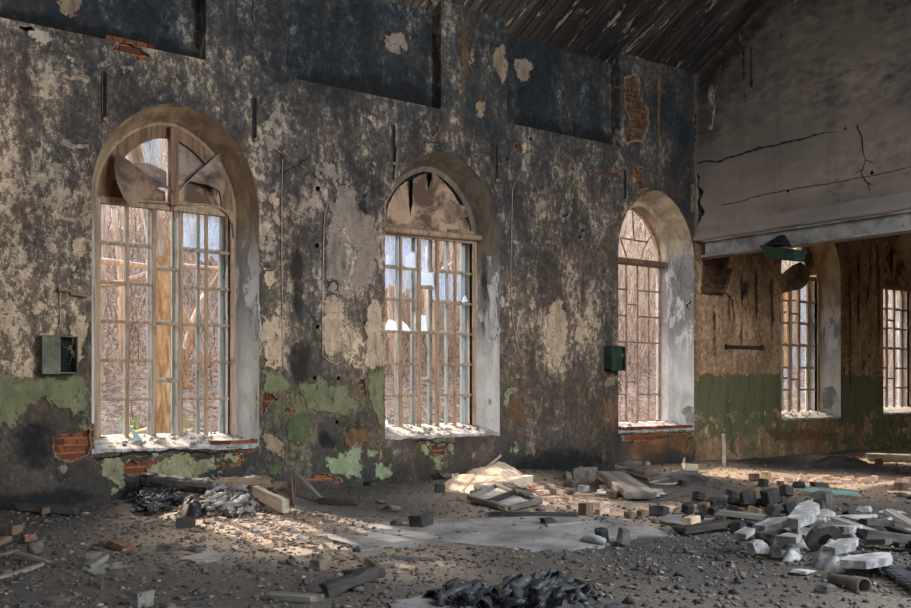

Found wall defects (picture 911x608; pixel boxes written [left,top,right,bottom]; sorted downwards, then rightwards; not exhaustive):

flaking render [55,0,83,18]
spalling [105,35,154,78]
flaking render [384,32,408,55]
flaking render [491,44,534,88]
flaking render [474,99,486,124]
spalling [624,73,650,146]
crack [695,114,909,205]
flaking render [68,233,87,291]
flaking render [68,313,89,362]
flaking render [251,160,394,484]
damp [848,252,880,387]
peeling [0,373,284,495]